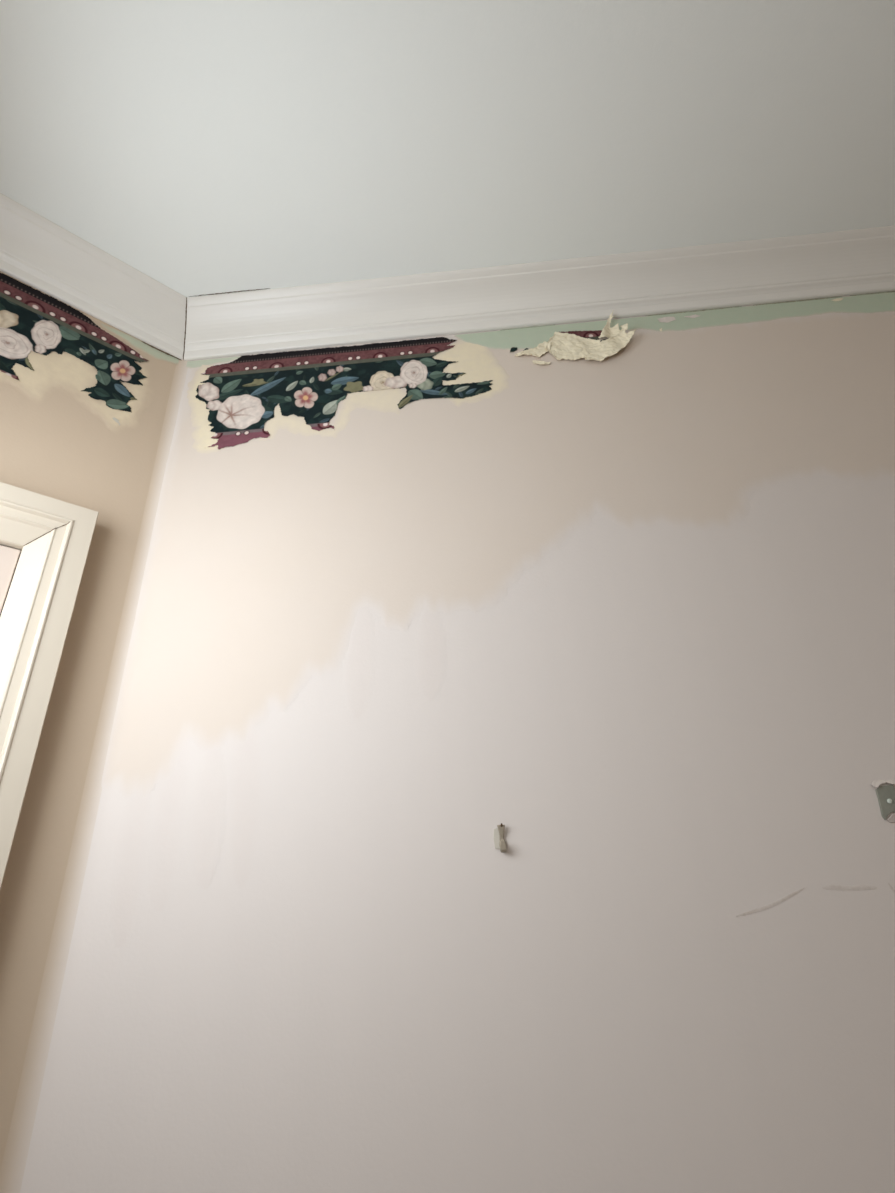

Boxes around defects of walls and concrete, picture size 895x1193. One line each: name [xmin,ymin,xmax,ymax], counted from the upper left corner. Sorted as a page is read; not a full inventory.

peeling [454,292,895,350]